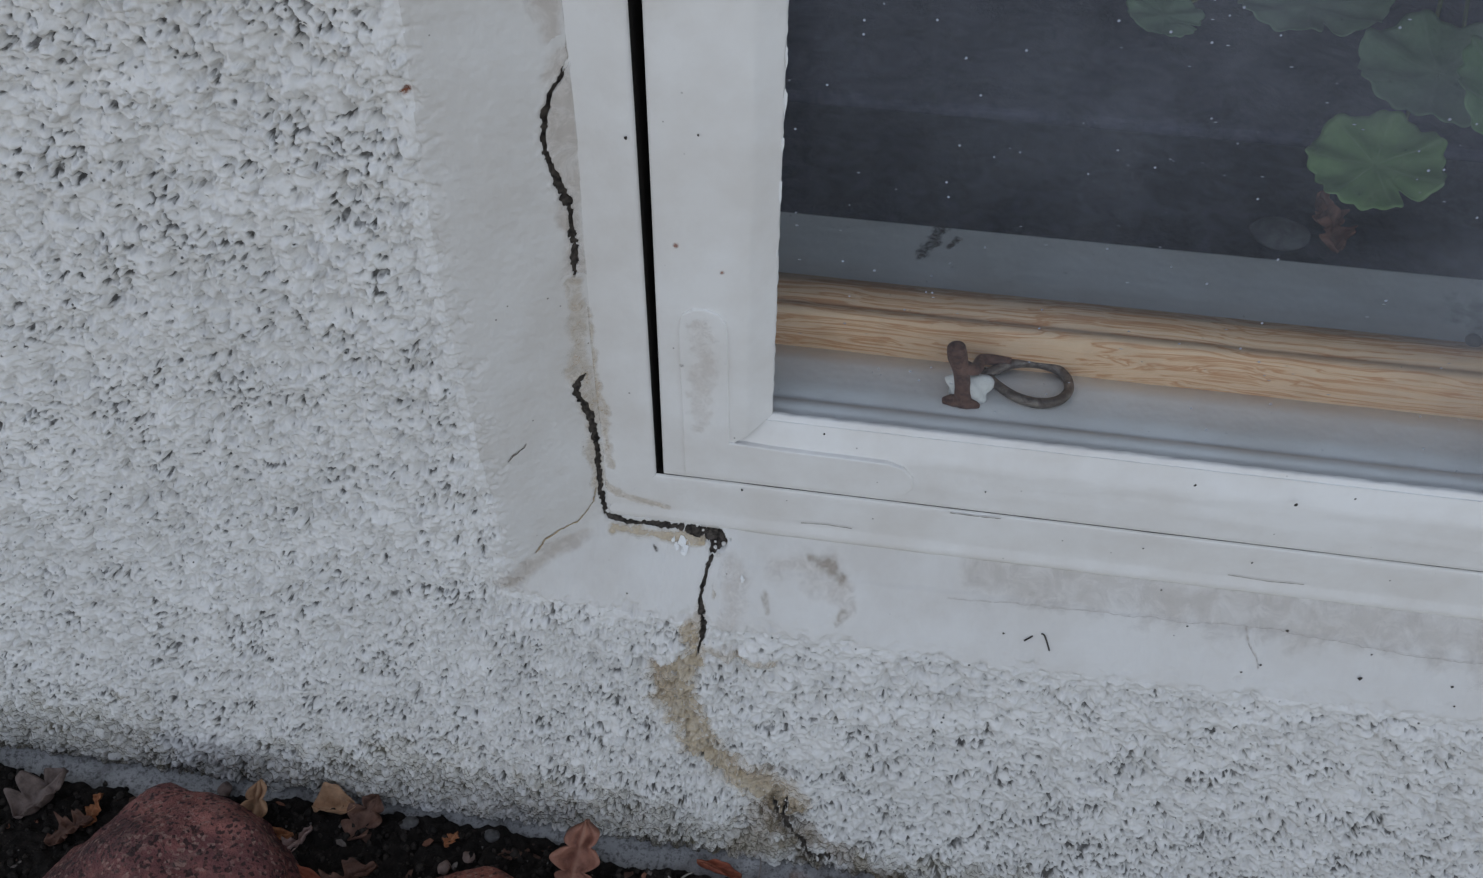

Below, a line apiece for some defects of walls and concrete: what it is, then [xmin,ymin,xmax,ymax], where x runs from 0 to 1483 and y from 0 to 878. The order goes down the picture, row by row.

crack [540,1,579,275]
crack [535,373,720,653]
crack [771,795,849,868]